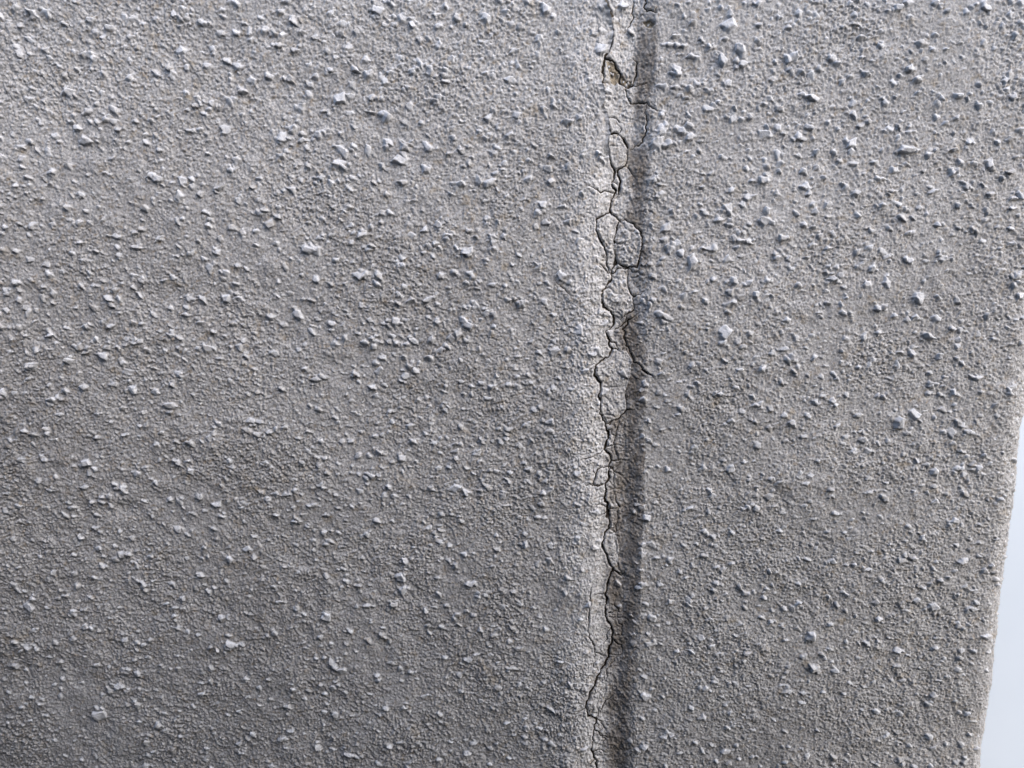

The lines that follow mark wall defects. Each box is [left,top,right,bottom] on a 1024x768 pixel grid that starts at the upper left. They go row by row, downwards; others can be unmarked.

crack [571,0,660,768]